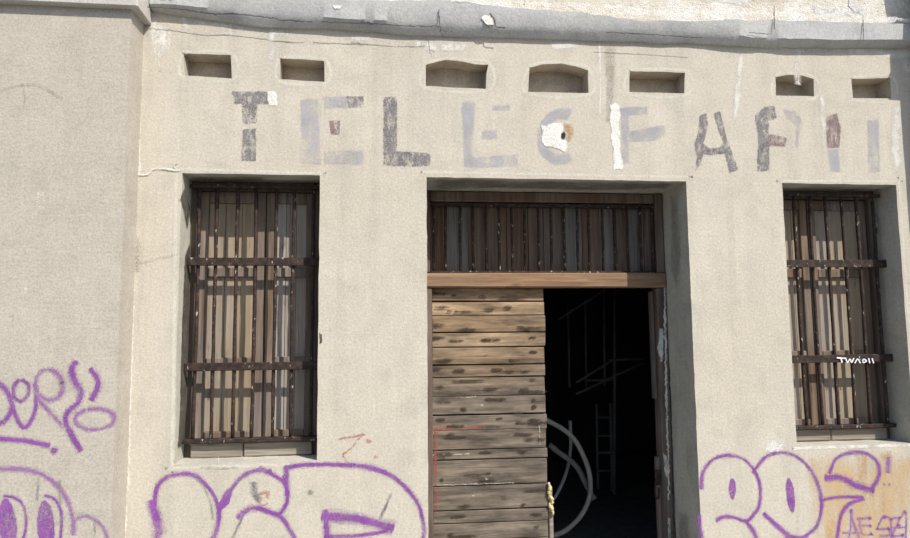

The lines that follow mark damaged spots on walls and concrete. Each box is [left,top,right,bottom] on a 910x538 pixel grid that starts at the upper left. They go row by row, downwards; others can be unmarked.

flaking render [446,0,910,23]
corrosion [803,450,910,538]